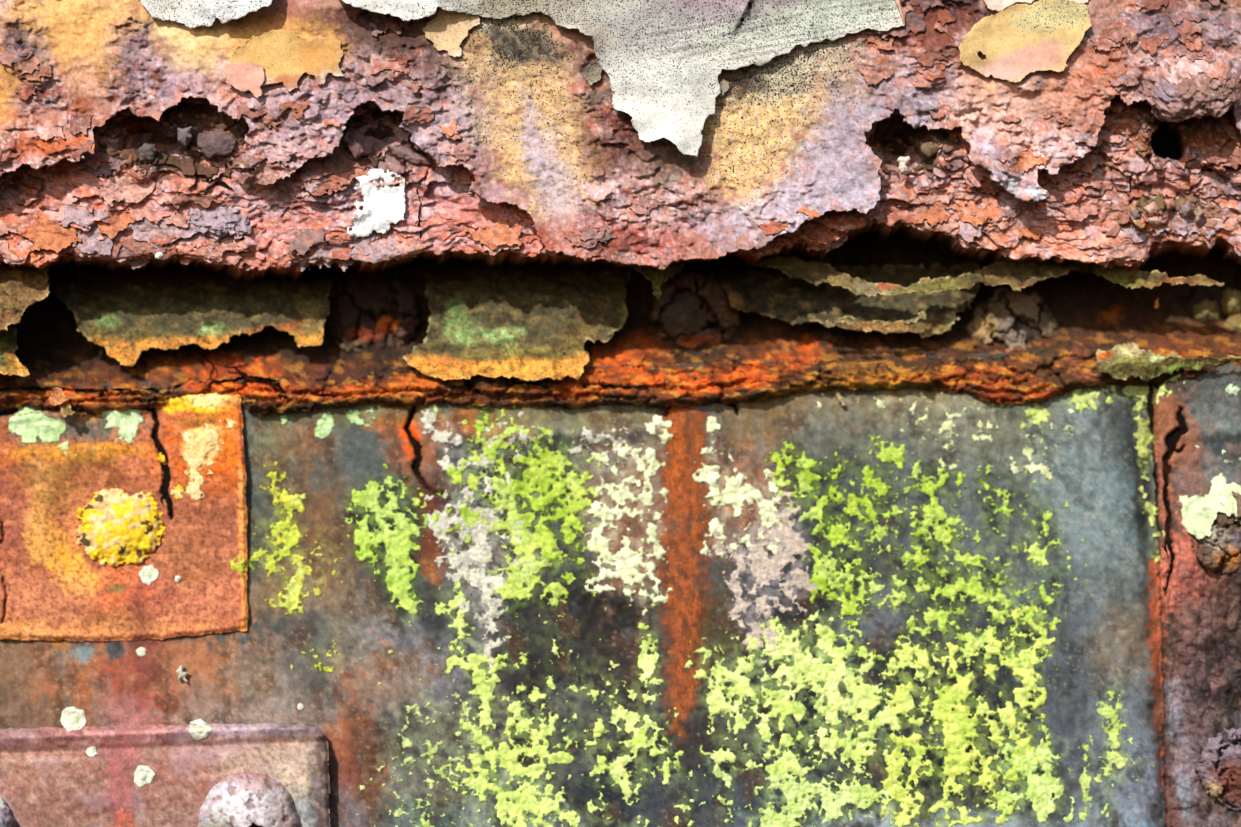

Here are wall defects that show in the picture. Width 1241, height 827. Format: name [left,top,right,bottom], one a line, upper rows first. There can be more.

peeling [140,0,272,28]
peeling [342,0,956,157]
peeling [910,0,1226,92]
peeling [0,30,432,377]
peeling [403,219,684,381]
peeling [702,145,1241,338]
crack [0,354,336,520]
crack [404,408,443,495]
corrosion [658,405,709,733]
crack [1146,382,1188,596]
corrosion [1148,558,1167,787]
corrosion [100,694,150,827]